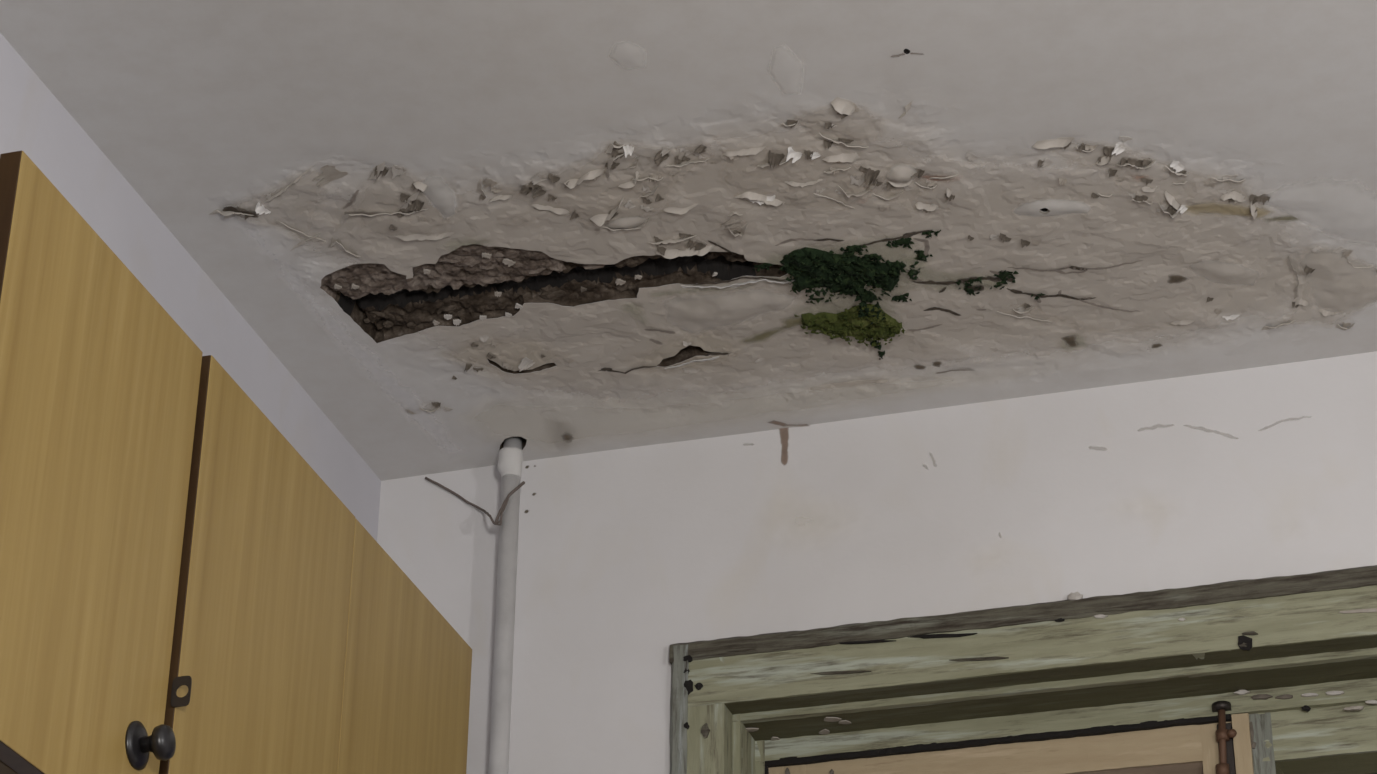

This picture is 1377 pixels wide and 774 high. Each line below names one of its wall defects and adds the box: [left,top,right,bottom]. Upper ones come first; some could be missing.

peeling [1032,136,1271,219]
spalling [209,97,979,380]
water stain [324,131,1315,389]
peeling [968,233,1042,248]
peeling [1206,297,1240,321]
peeling [1262,246,1374,331]
corrosion [769,421,807,465]